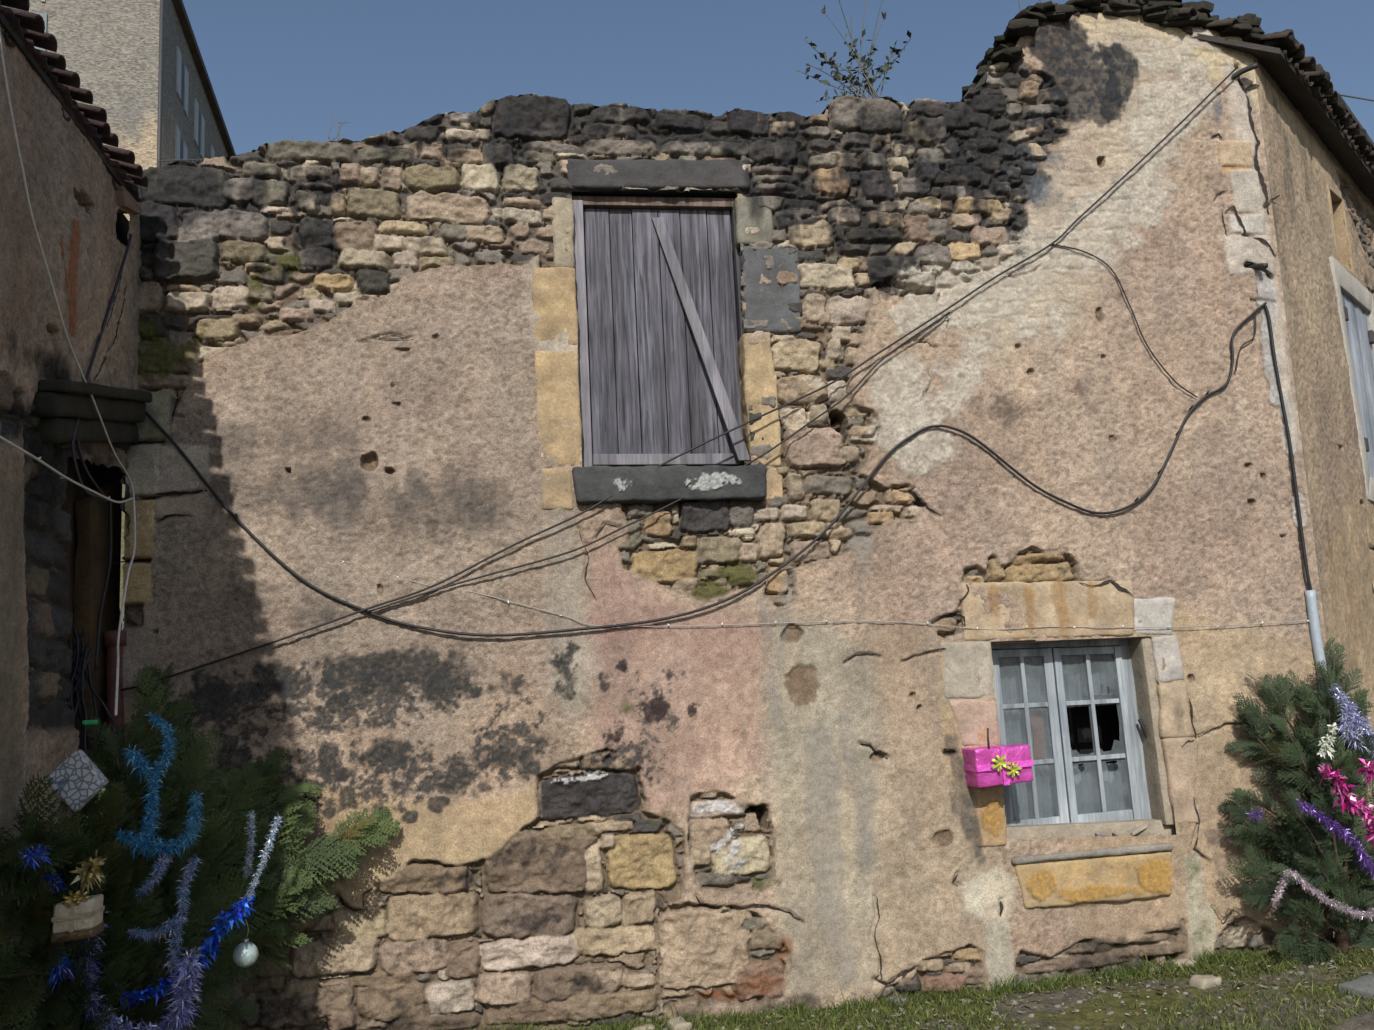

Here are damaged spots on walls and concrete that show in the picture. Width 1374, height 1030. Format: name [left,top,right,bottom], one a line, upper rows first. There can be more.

damp [136,160,267,282]
damp [253,167,343,286]
damp [380,132,400,161]
flaking render [137,58,1080,643]
damp [477,29,1222,475]
crack [1212,63,1280,304]
flaking render [123,604,158,634]
flaking render [200,746,792,1030]